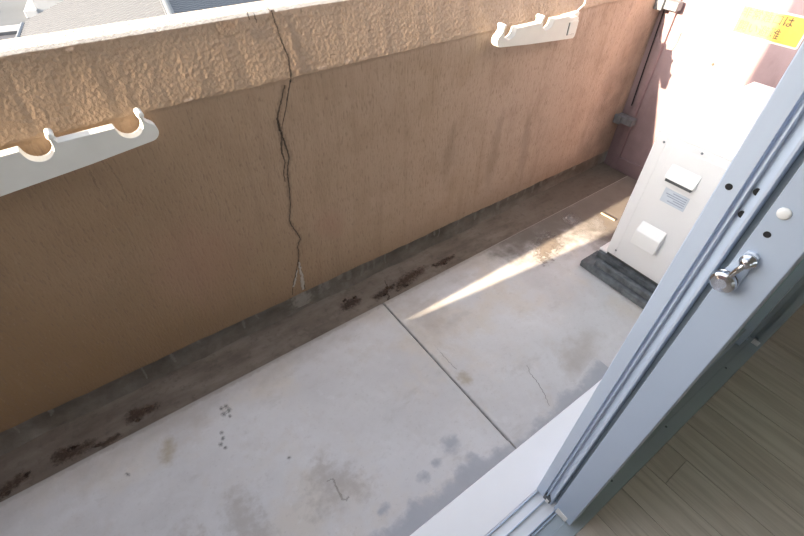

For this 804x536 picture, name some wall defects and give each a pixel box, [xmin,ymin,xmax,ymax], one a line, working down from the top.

crack [246,3,305,295]